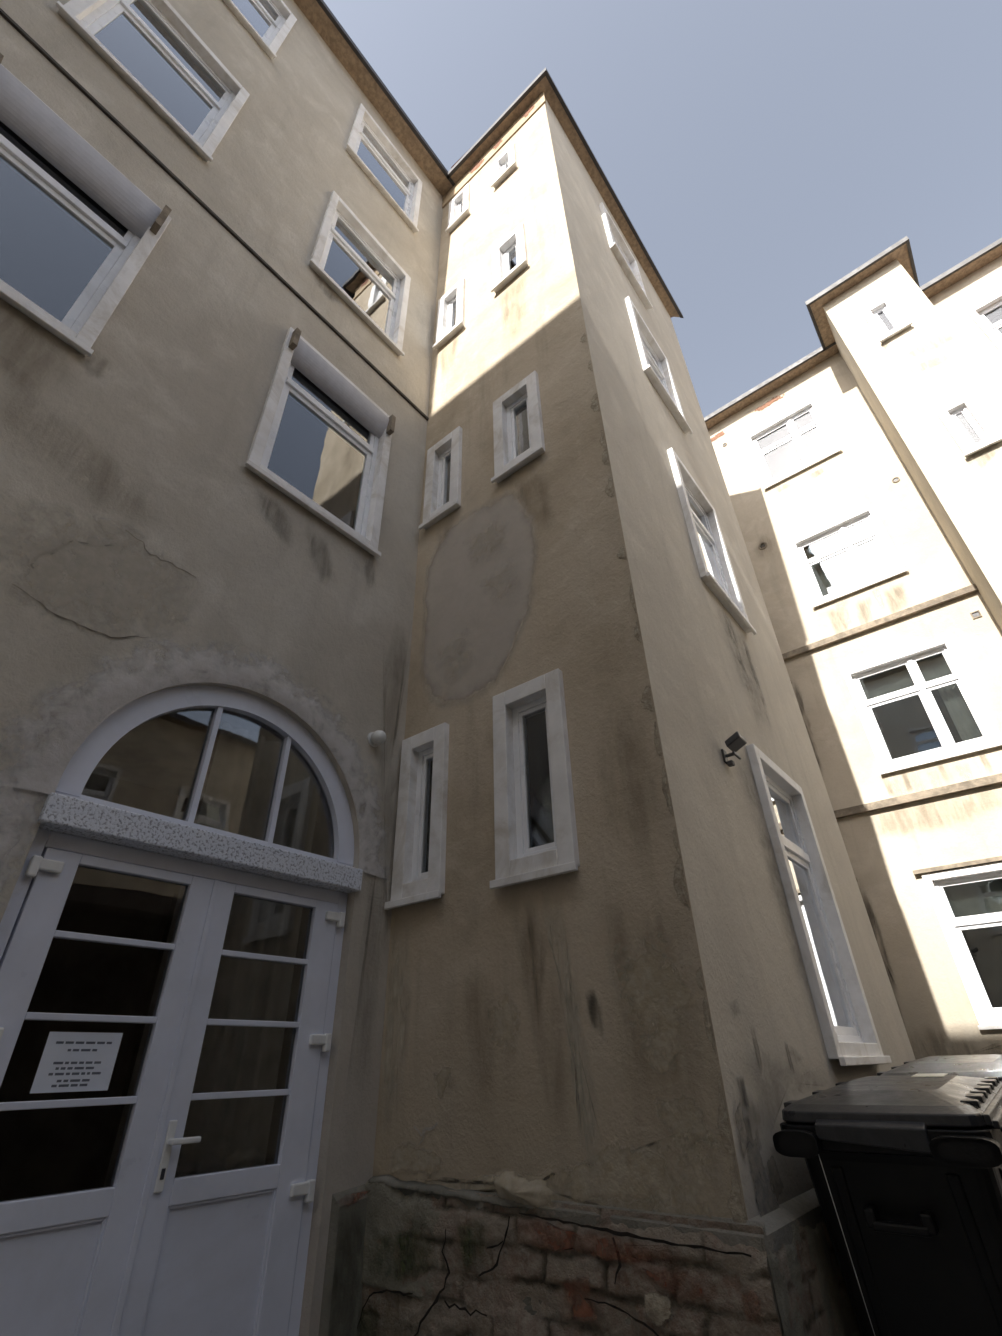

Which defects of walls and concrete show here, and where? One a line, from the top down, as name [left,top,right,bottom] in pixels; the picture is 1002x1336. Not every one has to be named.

spalling [599,431,614,496]
crack [12,530,196,639]
spalling [641,686,690,910]
flaking render [360,1074,860,1336]
crack [357,1213,752,1336]